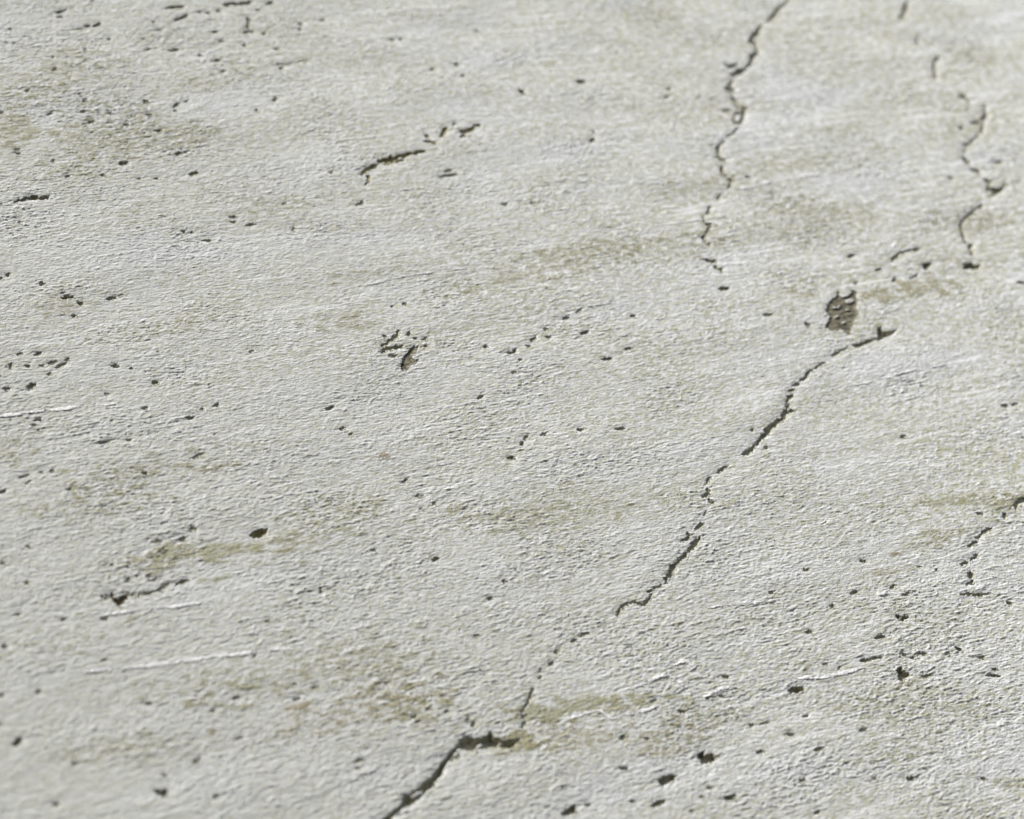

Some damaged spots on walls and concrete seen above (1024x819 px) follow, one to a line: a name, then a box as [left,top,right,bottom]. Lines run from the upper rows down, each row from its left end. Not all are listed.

crack [899,2,940,79]
crack [361,124,481,186]
crack [701,0,788,274]
crack [958,95,1006,256]
spalling [825,281,859,335]
crack [616,327,897,616]
crack [384,632,589,819]
crack [860,652,928,663]